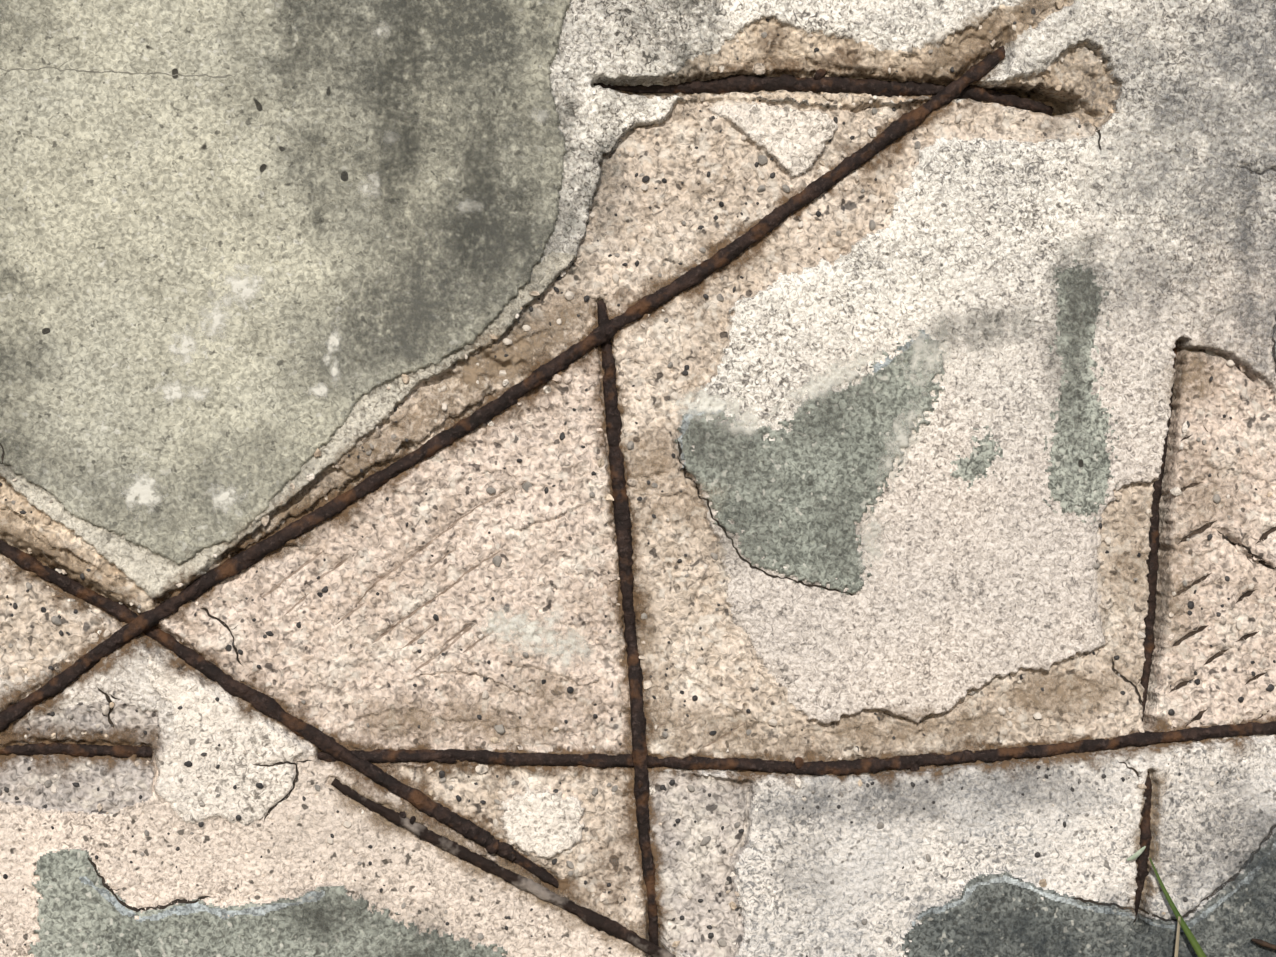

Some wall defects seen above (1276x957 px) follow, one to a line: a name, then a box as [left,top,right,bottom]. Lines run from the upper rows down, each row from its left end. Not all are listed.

rust [817,0,1052,171]
damp [269,0,572,360]
damp [169,264,263,364]
damp [311,333,339,396]
peeling [0,0,1276,762]
rust [1172,354,1208,400]
damp [125,474,160,507]
damp [209,489,236,511]
rust [0,187,814,954]
spalling [0,346,1276,957]
rust [642,670,1276,783]
rust [1133,774,1164,905]